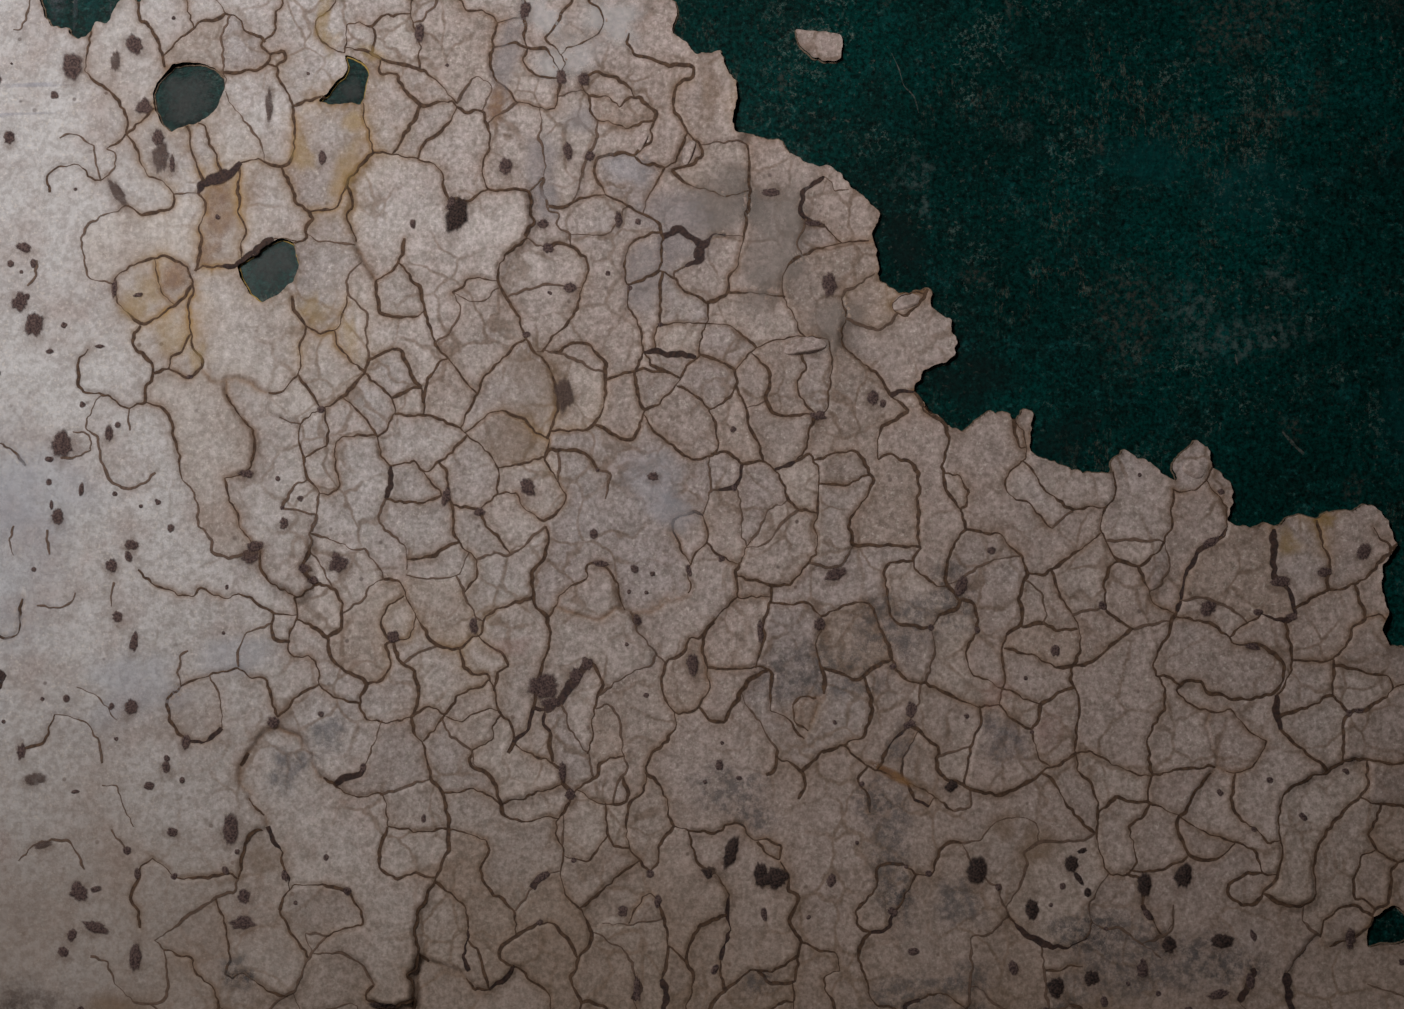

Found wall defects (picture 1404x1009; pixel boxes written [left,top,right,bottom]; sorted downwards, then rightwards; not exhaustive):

peeling [41,0,141,39]
peeling [154,64,225,132]
peeling [320,56,369,105]
crack [782,176,869,279]
peeling [238,239,299,302]
peeling [672,0,1404,647]
crack [46,0,840,1009]
crack [629,273,1404,1009]
crack [25,687,133,848]
spalling [702,837,738,878]
spalling [754,863,789,889]
peeling [1367,905,1404,947]